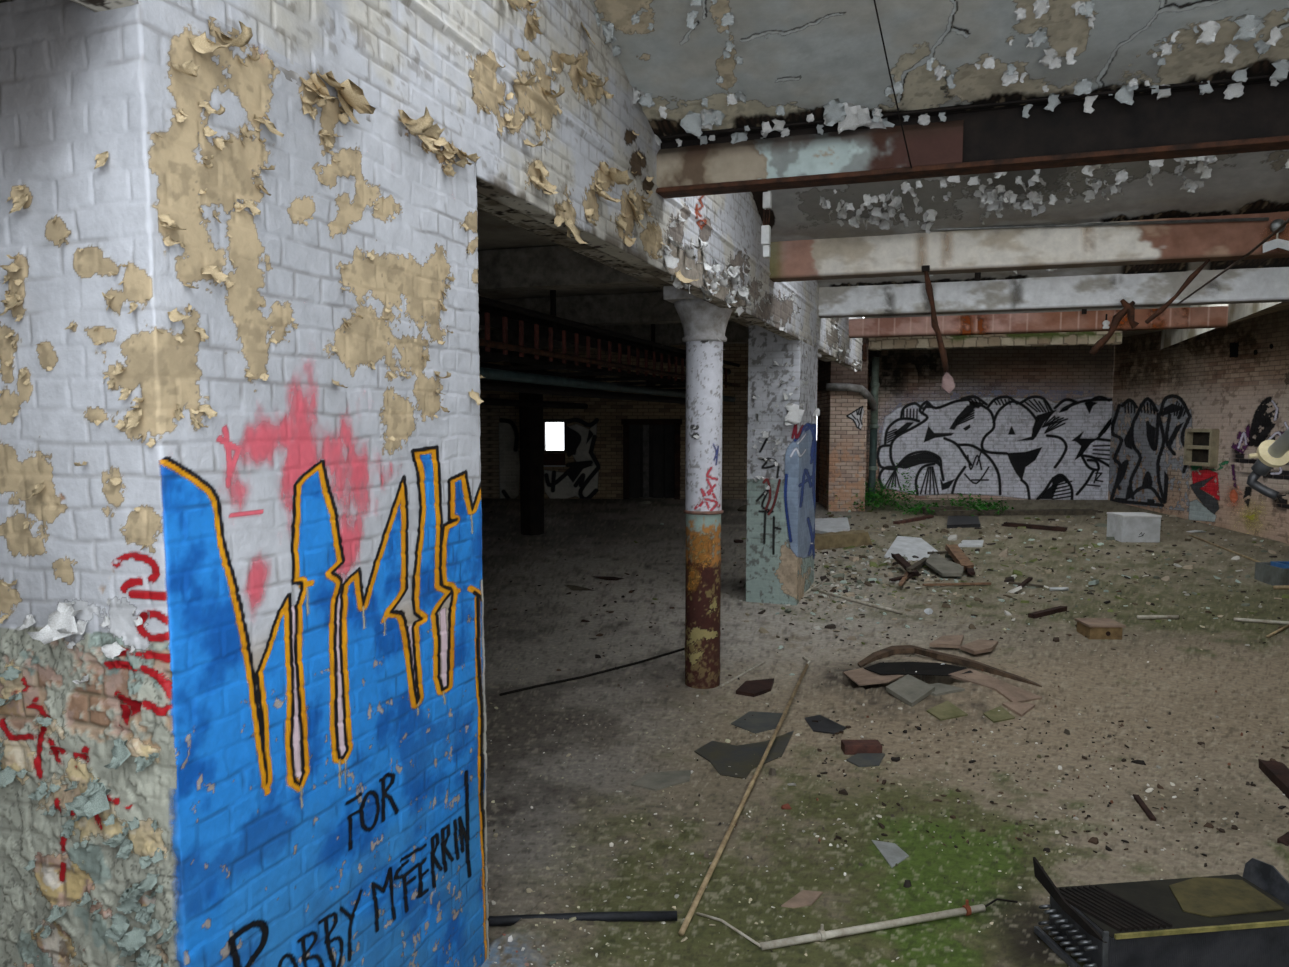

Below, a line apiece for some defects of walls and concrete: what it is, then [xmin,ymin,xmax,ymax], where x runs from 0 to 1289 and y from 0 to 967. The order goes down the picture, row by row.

crack [740,12,846,42]
crack [897,0,971,103]
crack [1096,0,1225,88]
peeling [45,17,298,448]
peeling [287,68,403,239]
peeling [467,0,1289,331]
corrosion [1266,222,1289,241]
peeling [323,240,456,455]
corrosion [960,315,988,335]
peeling [0,441,149,659]
corrosion [684,627,718,665]
peeling [0,737,176,967]